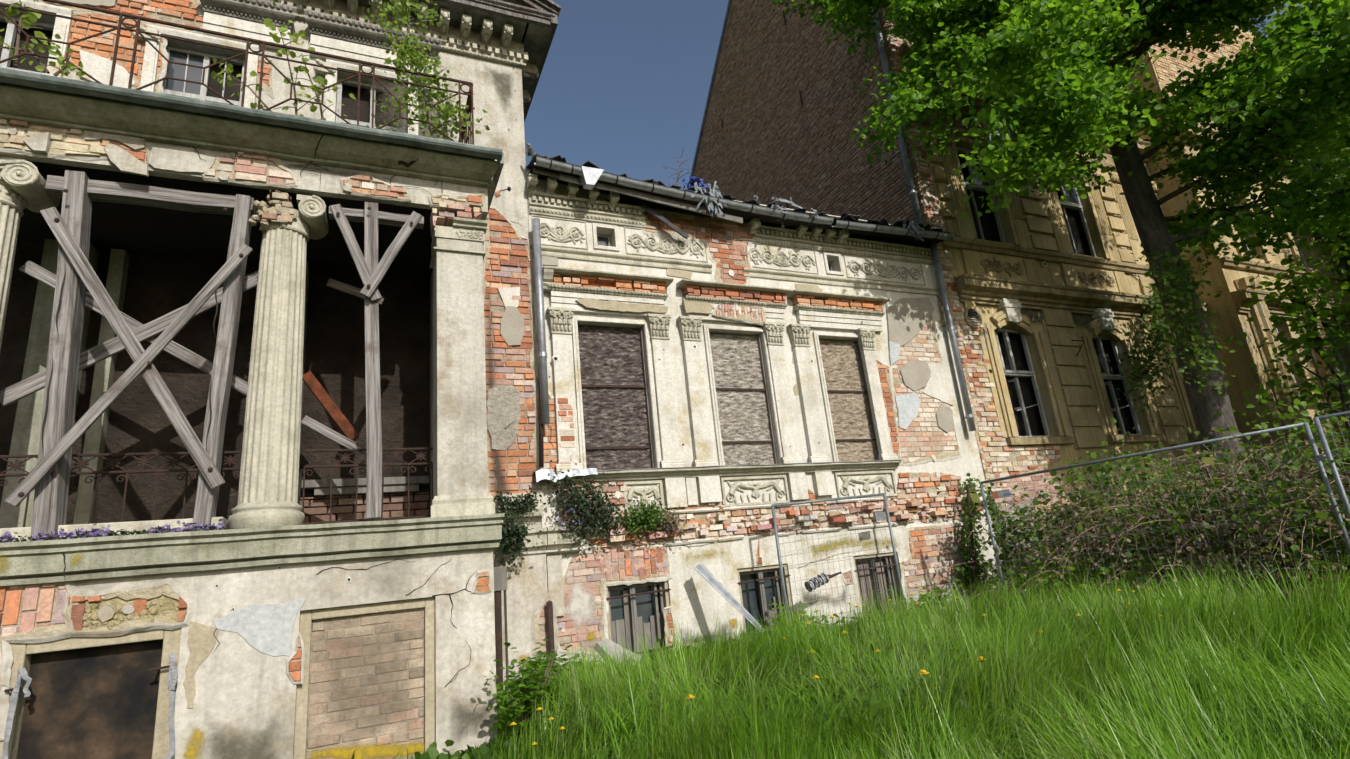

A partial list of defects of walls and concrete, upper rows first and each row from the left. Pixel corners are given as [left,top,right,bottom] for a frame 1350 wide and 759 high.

flaking render [35,0,204,94]
flaking render [0,119,298,232]
flaking render [339,172,411,202]
flaking render [427,187,1061,657]
flaking render [0,577,194,741]
flaking render [286,631,305,685]
crack [316,559,471,687]